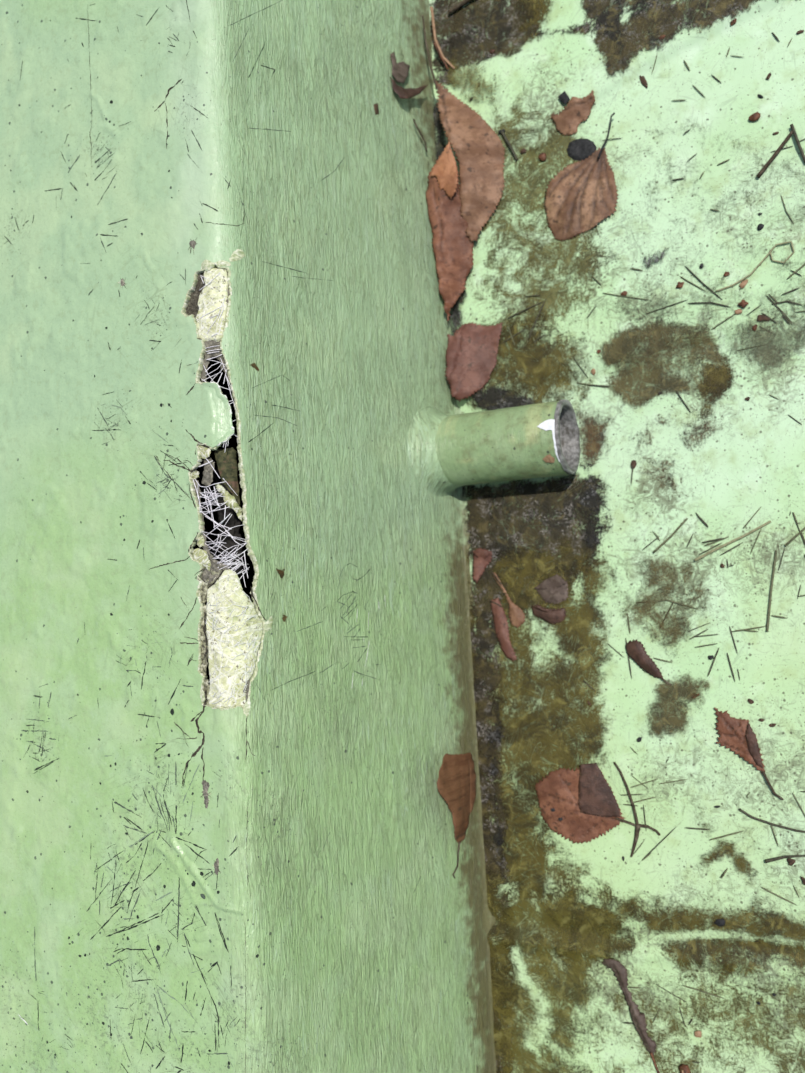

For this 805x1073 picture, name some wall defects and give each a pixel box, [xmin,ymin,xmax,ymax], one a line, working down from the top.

crack [150,430,208,786]
spalling [181,238,273,716]
damp [578,464,604,549]